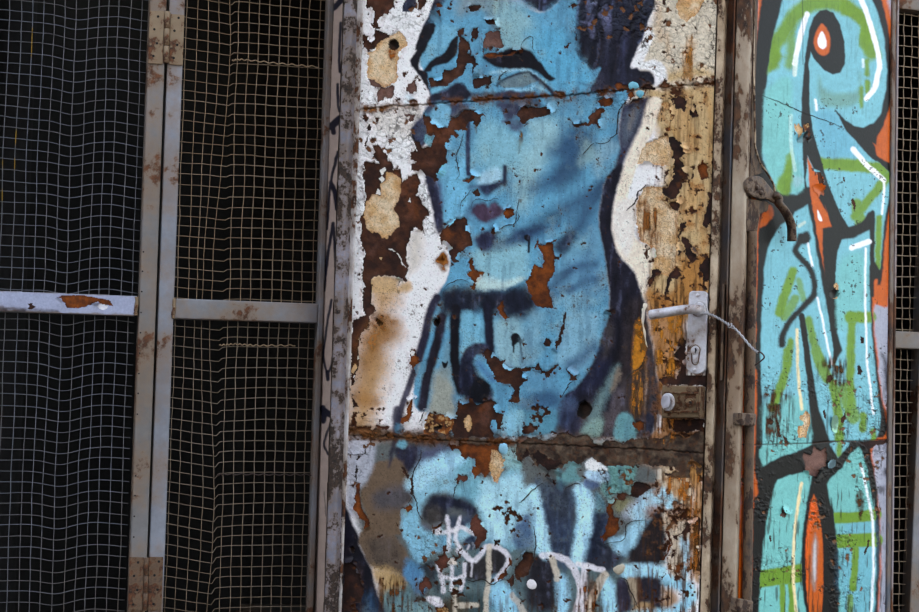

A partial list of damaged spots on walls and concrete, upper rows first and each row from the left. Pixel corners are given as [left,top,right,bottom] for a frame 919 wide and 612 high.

peeling [673,0,704,22]
peeling [367,31,408,88]
peeling [363,172,402,239]
peeling [636,136,682,276]
rust [526,237,557,309]
rust [55,295,113,310]
rust [539,312,566,354]
rust [348,348,579,484]
peeling [489,450,506,483]